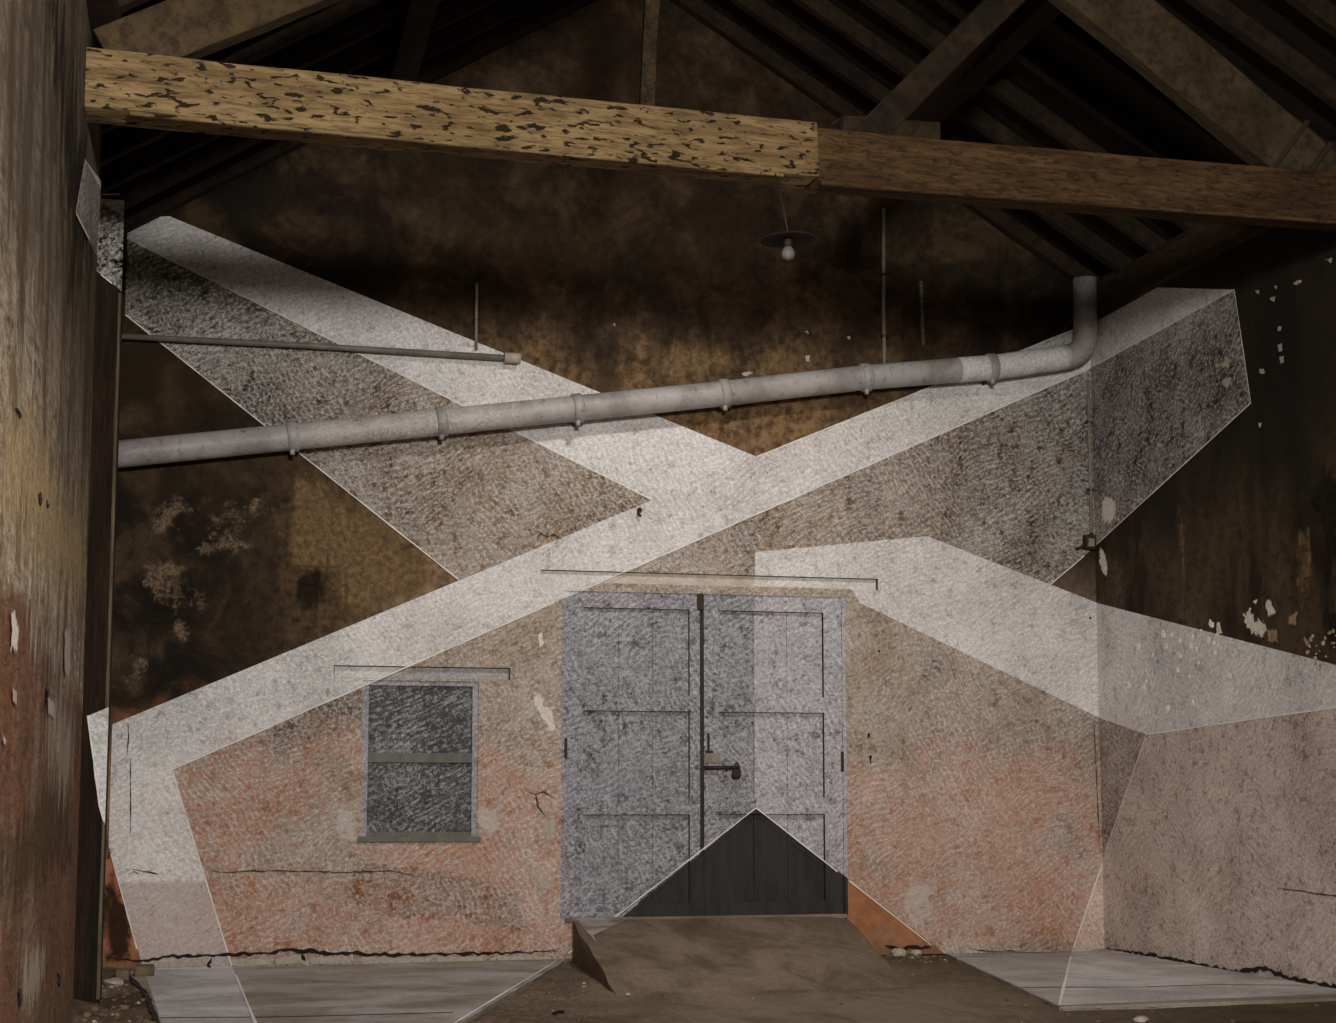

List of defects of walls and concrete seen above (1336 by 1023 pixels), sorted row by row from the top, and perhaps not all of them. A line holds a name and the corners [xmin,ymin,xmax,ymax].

peeling [1243,599,1336,668]
crack [110,948,558,1023]